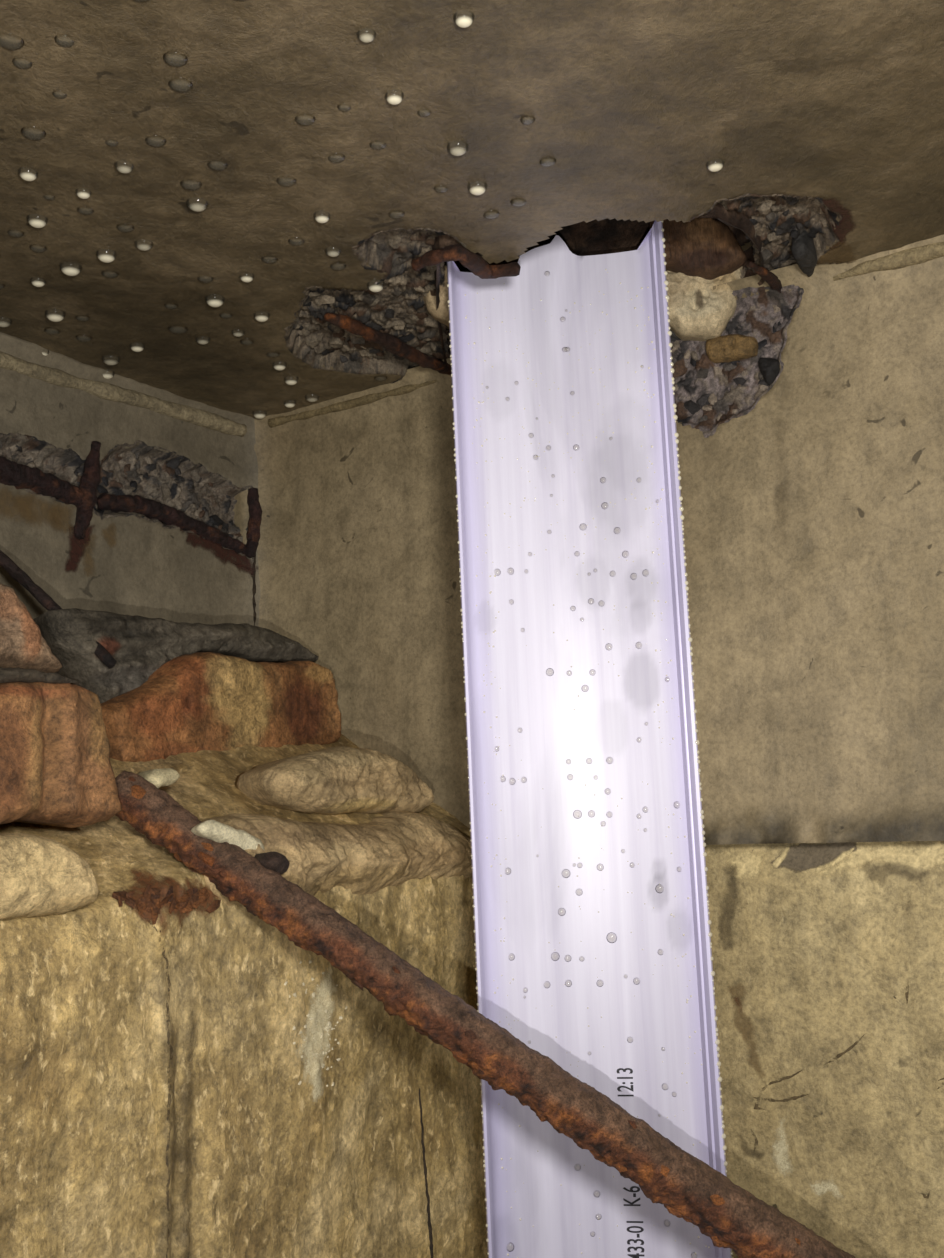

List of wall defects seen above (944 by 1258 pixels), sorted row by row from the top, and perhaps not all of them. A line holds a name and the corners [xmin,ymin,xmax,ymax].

rust [817,198,855,264]
spalling [284,228,521,384]
spalling [670,193,842,438]
rust [66,527,114,571]
spalling [0,433,262,563]
rust [186,532,254,574]
rust [112,870,221,929]
crack [751,1034,865,1151]